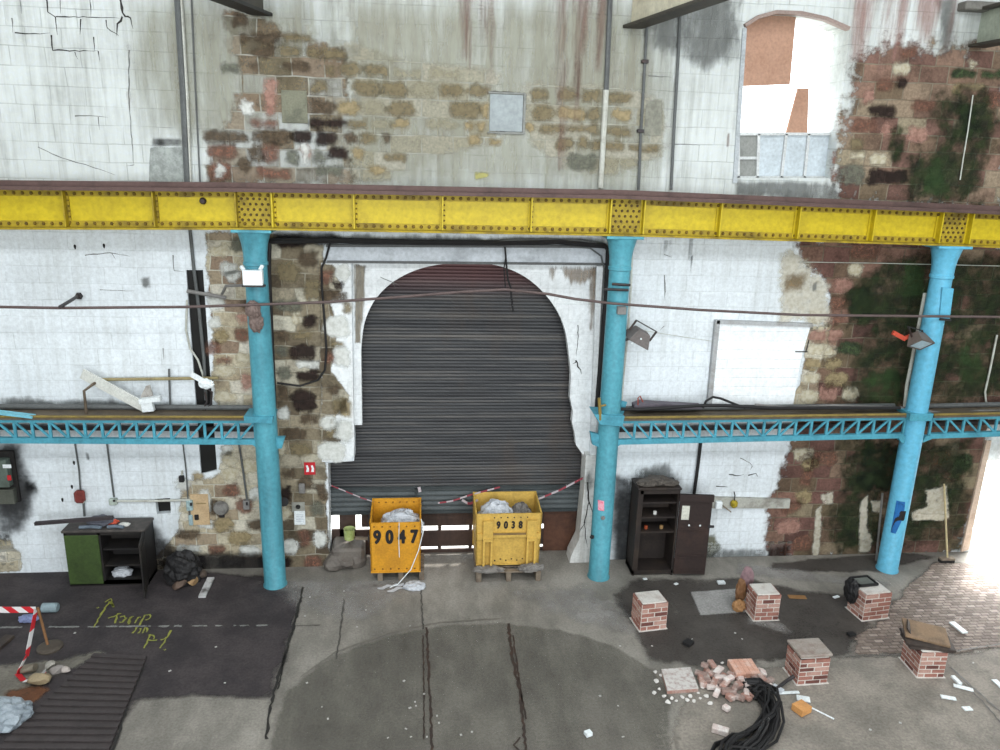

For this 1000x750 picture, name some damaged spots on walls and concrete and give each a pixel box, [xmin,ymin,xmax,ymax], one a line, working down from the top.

crack [11,0,134,175]
peeling [204,11,501,184]
peeling [525,83,663,174]
leakage [656,1,737,67]
spalling [830,36,1000,206]
peeling [205,231,253,405]
peeling [270,234,353,567]
spalling [779,242,931,406]
peeling [157,445,263,570]
spalling [764,420,902,556]
spalling [901,419,1000,553]
crack [265,587,527,750]